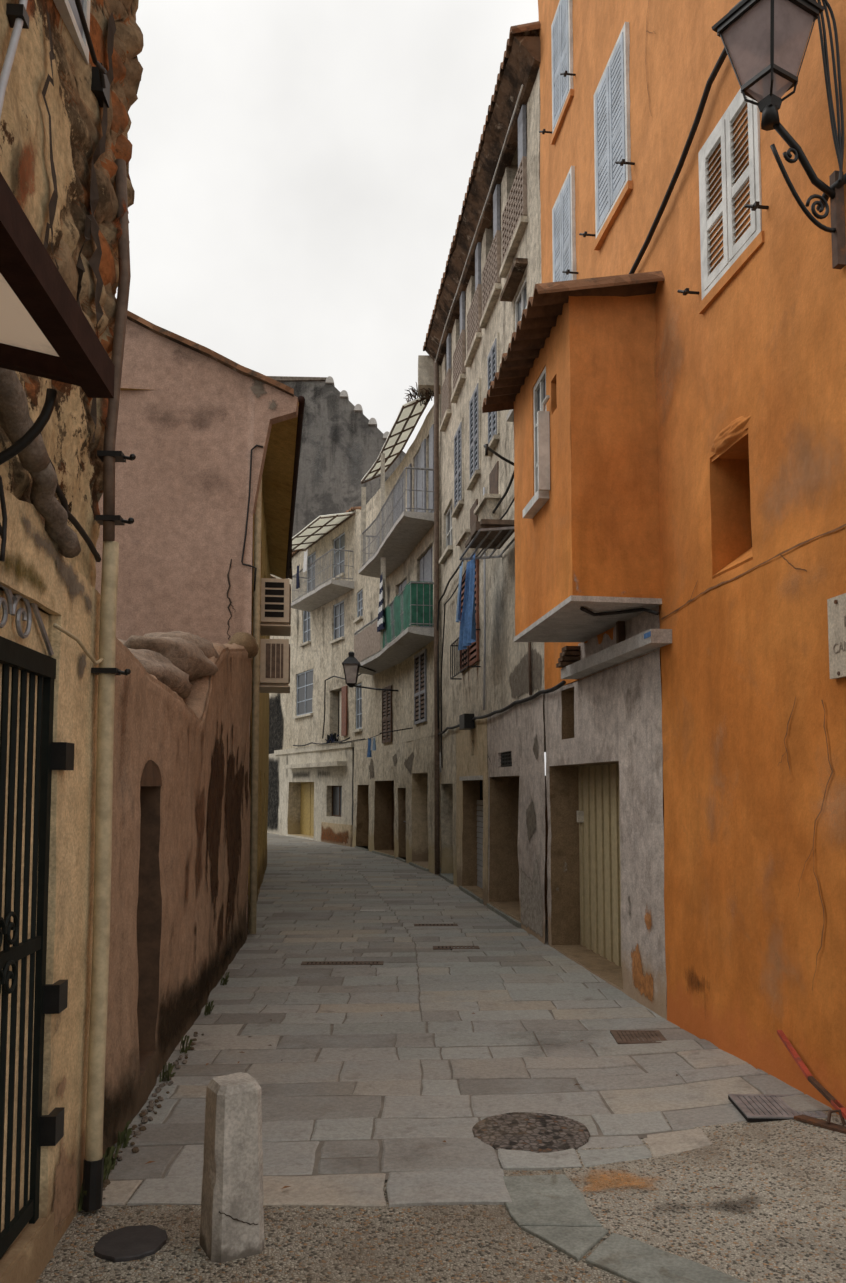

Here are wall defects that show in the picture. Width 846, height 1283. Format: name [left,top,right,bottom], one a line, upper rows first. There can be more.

flaking render [17,141,35,209]
crack [778,697,833,991]
flaking render [628,897,652,930]
flaking render [631,944,653,1001]